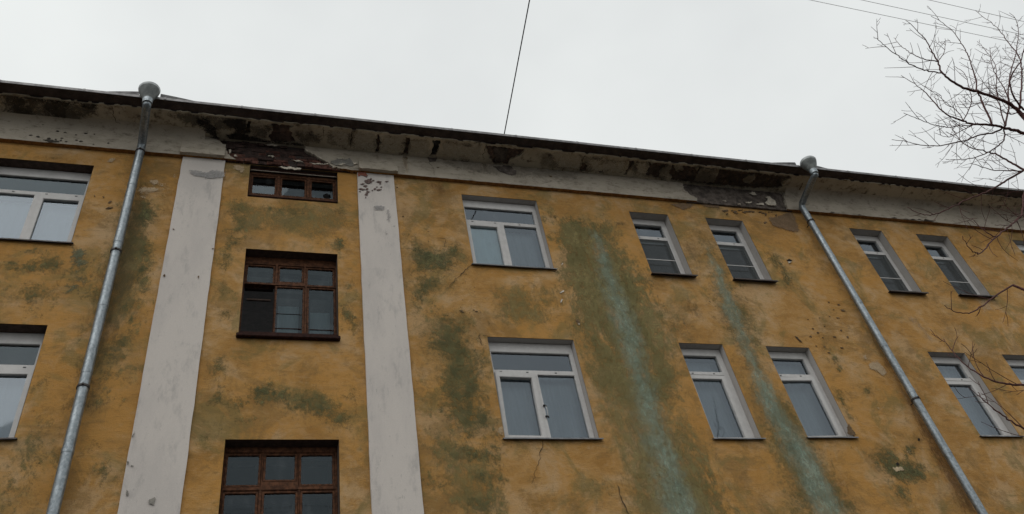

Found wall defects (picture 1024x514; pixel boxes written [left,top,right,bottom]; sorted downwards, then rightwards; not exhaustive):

water stain [0,95,98,119]
flaking render [213,121,398,198]
flaking render [427,140,440,168]
flaking render [486,145,523,175]
flaking render [646,162,803,232]